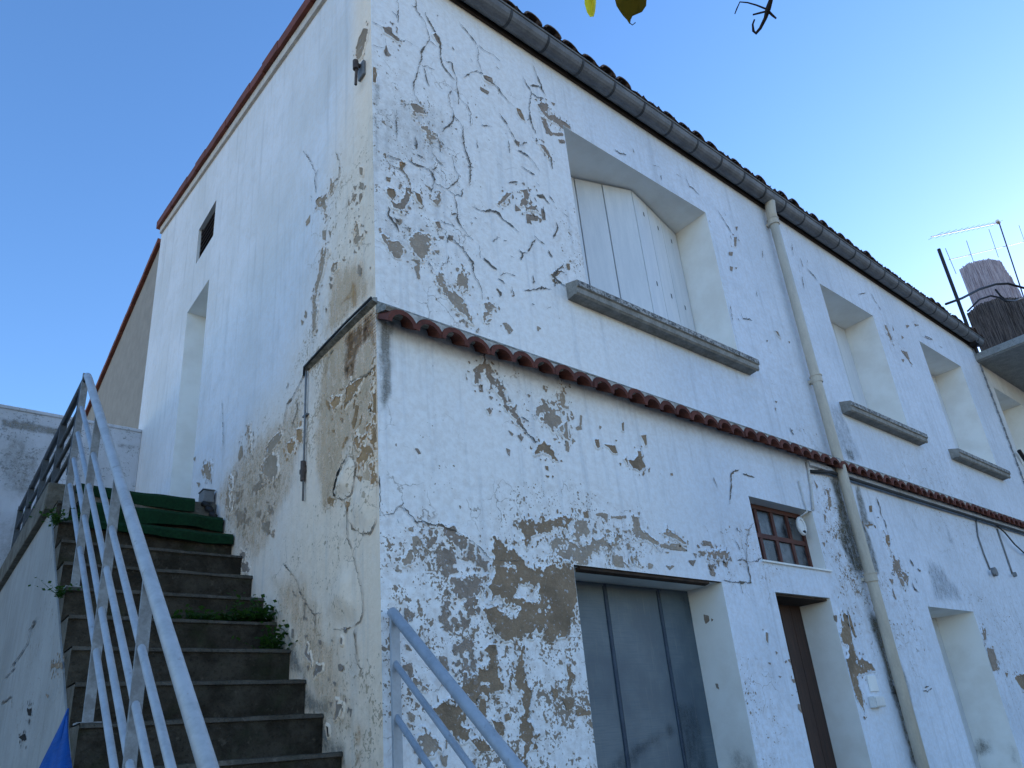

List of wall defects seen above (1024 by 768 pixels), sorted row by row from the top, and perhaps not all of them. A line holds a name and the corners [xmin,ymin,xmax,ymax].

peeling [301,160,514,336]
crack [375,0,567,309]
peeling [496,183,546,224]
peeling [535,98,572,161]
peeling [223,421,304,538]
peeling [466,354,582,478]
peeling [592,421,650,476]
crack [284,456,518,676]
peeling [396,521,531,687]
peeling [549,508,732,576]
crack [725,524,761,592]
peeling [985,643,1024,693]